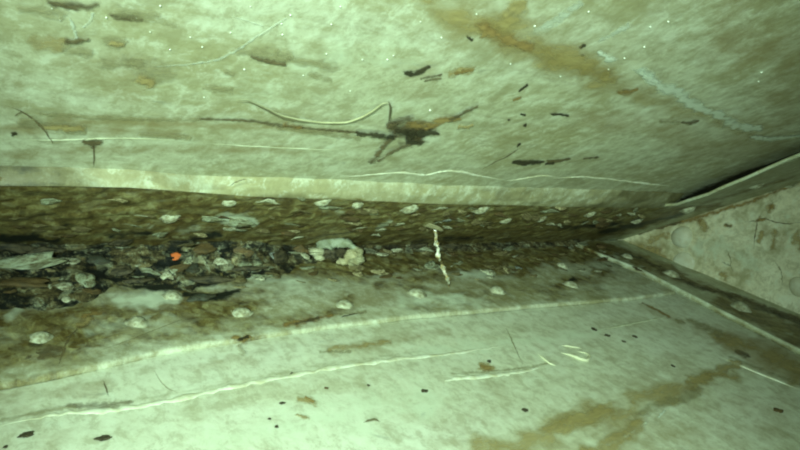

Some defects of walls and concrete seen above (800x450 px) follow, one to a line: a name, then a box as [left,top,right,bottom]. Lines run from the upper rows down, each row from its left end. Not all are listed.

rust [439,0,612,89]
rust [200,106,478,164]
crack [678,153,798,202]
leakage [473,319,800,450]